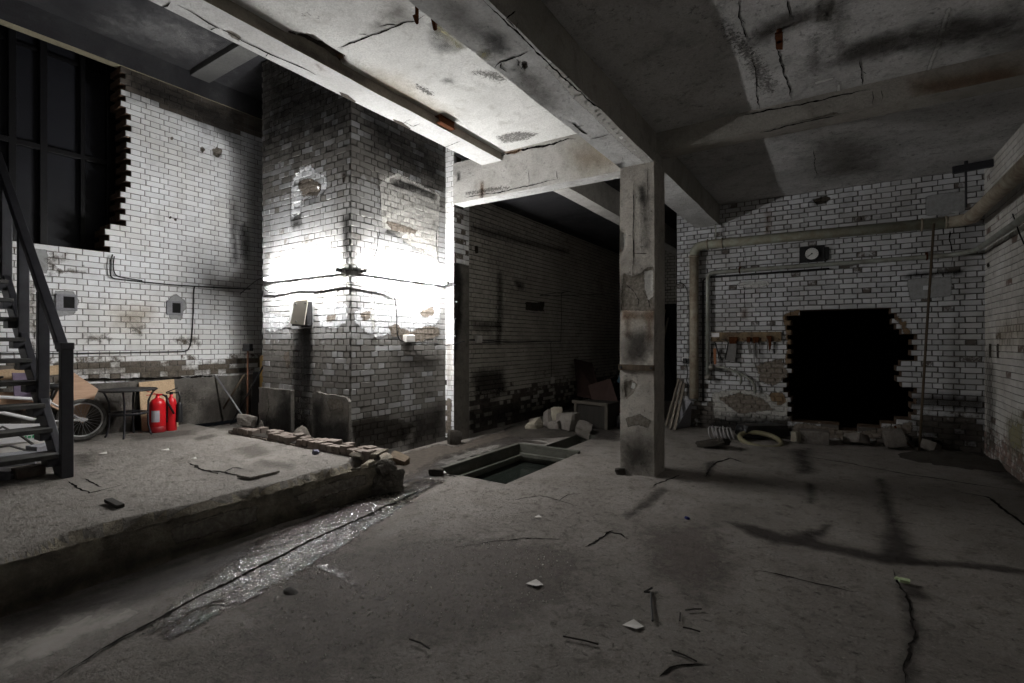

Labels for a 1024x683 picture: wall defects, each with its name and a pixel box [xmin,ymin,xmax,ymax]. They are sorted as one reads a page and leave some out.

crack [338,16,423,48]
crack [738,2,883,116]
crack [469,0,608,197]
peeling [291,165,327,228]
peeling [711,310,913,440]
spalling [626,414,650,428]
crack [189,463,242,476]
crack [706,458,746,476]
crack [806,456,1024,525]
crack [893,568,917,682]